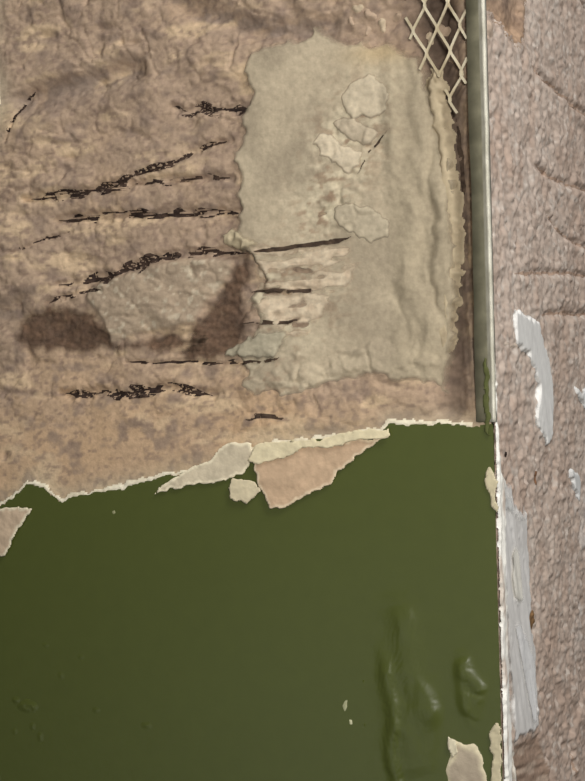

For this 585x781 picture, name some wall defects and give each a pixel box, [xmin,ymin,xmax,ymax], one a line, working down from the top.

spalling [486,0,527,50]
crack [6,92,36,140]
crack [175,101,248,118]
crack [19,141,239,249]
crack [50,236,351,303]
spalling [0,0,491,556]
crack [242,318,298,326]
crack [65,357,279,401]
peeling [446,737,487,781]